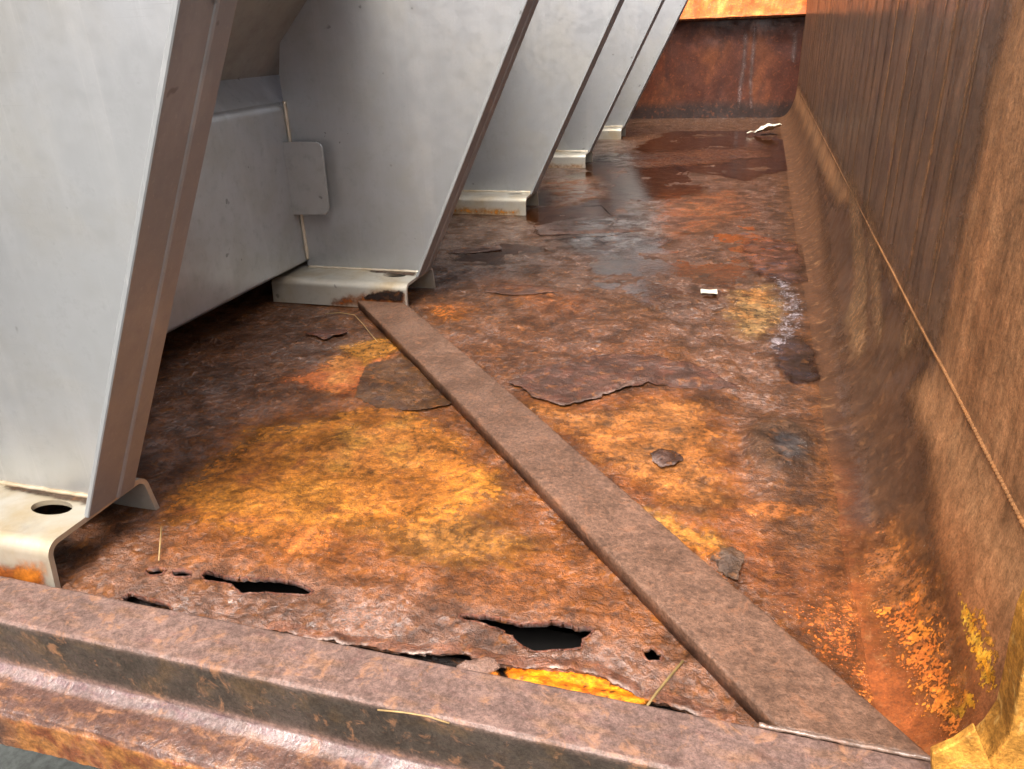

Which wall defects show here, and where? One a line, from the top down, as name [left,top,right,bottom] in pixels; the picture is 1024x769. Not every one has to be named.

water stain [541,176,611,207]
water stain [557,189,751,256]
water stain [595,146,773,168]
corrosion [285,338,398,395]
corrosion [432,303,471,320]
water stain [725,233,821,384]
water stain [792,0,1012,681]
corrosion [161,407,531,565]
corrosion [526,396,807,580]
peeling [265,620,736,723]
corrosion [490,667,647,704]
corrosion [775,521,999,740]